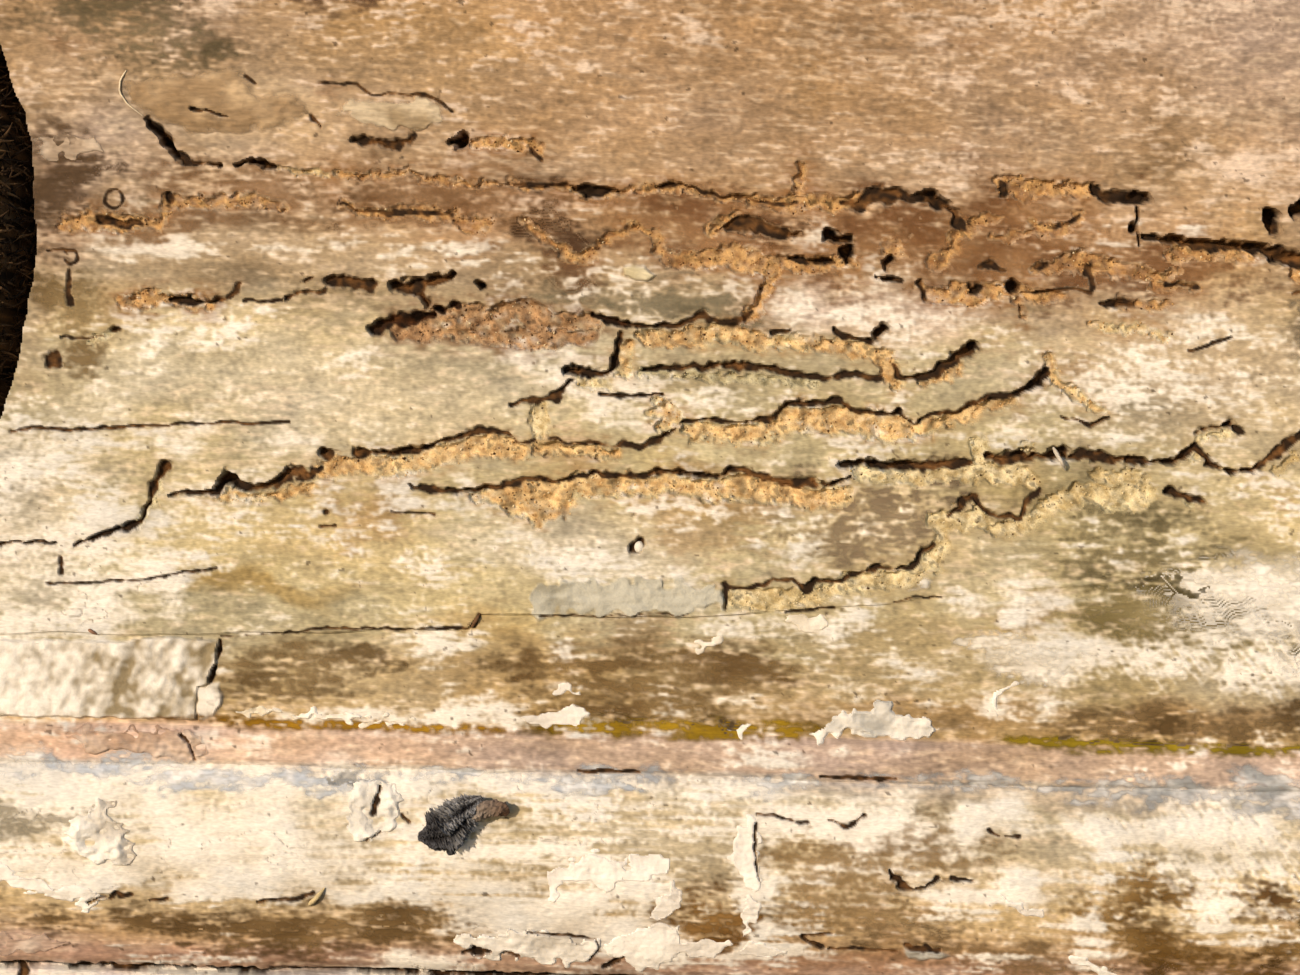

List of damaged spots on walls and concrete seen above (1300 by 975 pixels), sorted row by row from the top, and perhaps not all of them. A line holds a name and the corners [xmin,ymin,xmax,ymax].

crack [310,82,454,129]
crack [635,361,884,390]
crack [10,420,291,434]
crack [1194,421,1247,447]
crack [0,460,220,586]
crack [1163,486,1206,514]
peeling [809,700,940,746]
spalling [62,798,137,871]
spalling [345,780,404,842]
peeling [0,862,107,913]
peeling [453,814,787,972]
peeling [1068,955,1117,975]